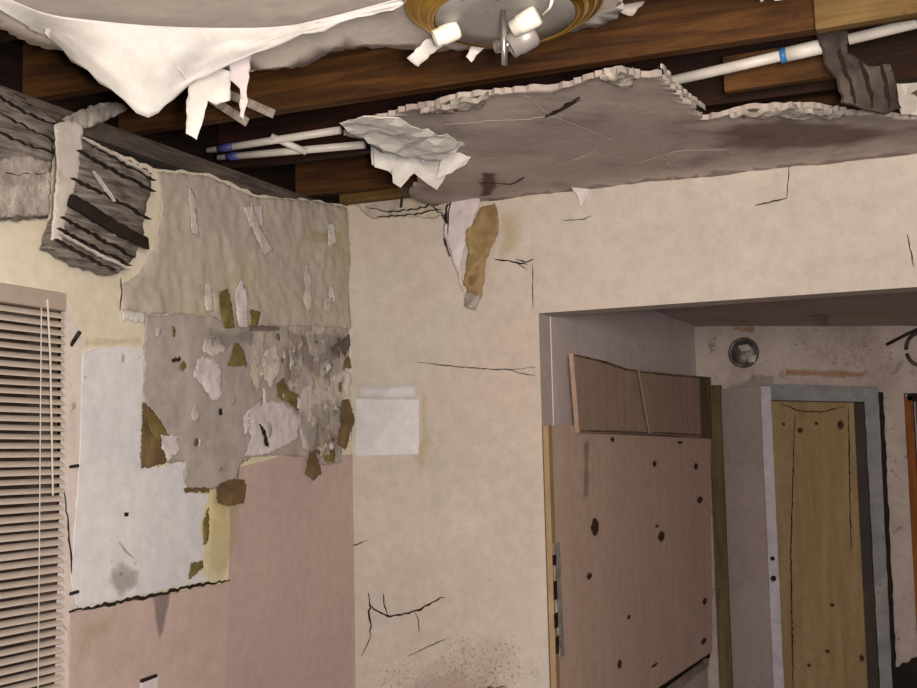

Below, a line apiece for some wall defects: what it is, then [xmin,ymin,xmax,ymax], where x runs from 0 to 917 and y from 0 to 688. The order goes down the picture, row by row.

spalling [600,65,639,88]
spalling [730,103,845,121]
spalling [0,87,57,222]
peeling [193,338,226,401]
peeling [243,345,312,461]
peeling [306,327,419,456]
crack [361,593,447,656]